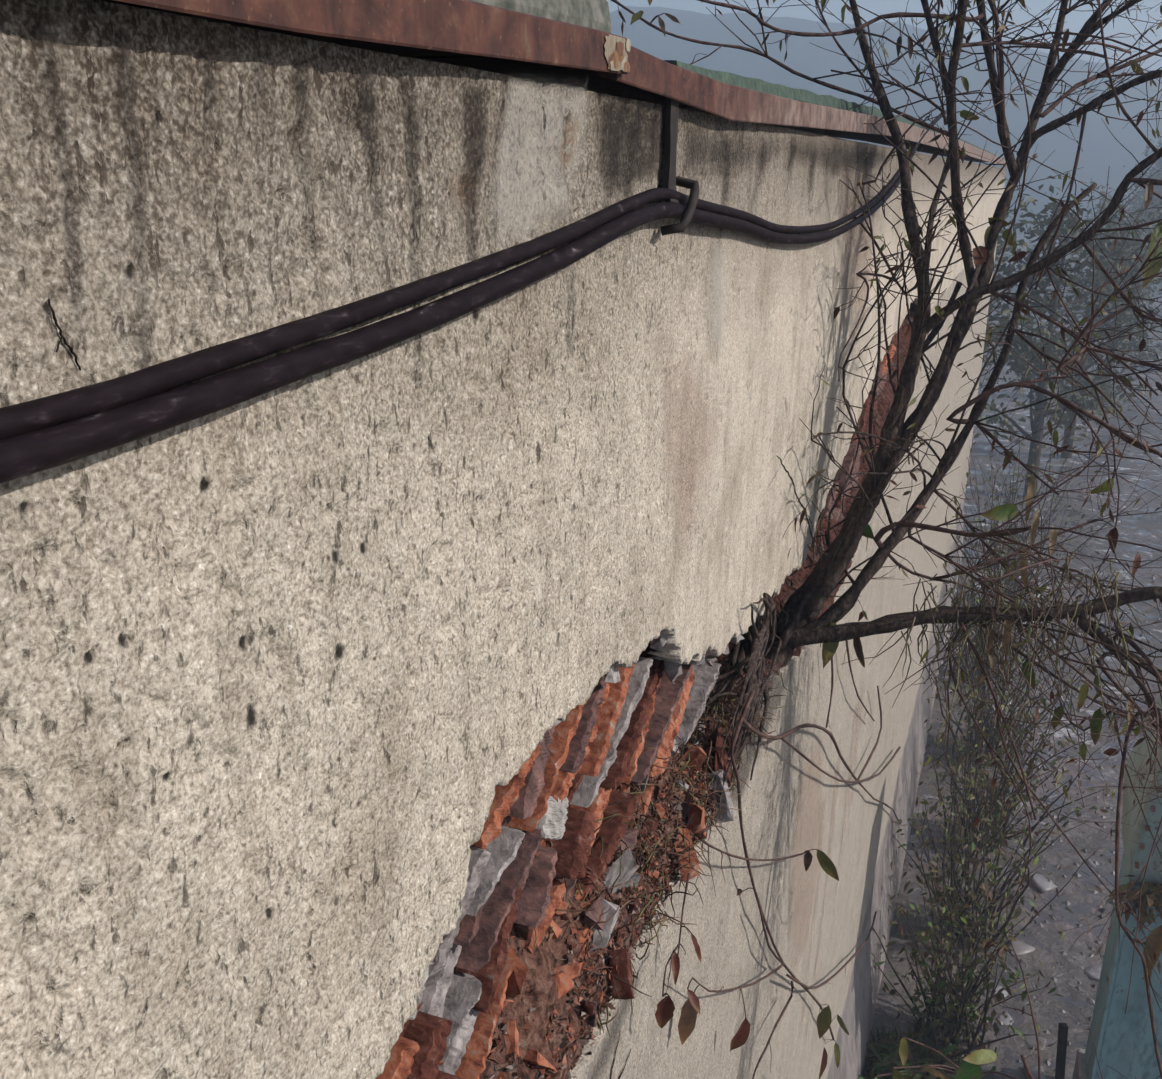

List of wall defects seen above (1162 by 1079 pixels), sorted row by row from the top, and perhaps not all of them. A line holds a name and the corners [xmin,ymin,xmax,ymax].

leakage [39,20,82,305]
leakage [297,62,310,170]
leakage [401,78,422,280]
leakage [462,88,488,260]
leakage [497,84,582,233]
leakage [602,100,663,194]
crack [48,299,81,370]
spalling [376,633,745,1079]
crack [610,1033,631,1079]